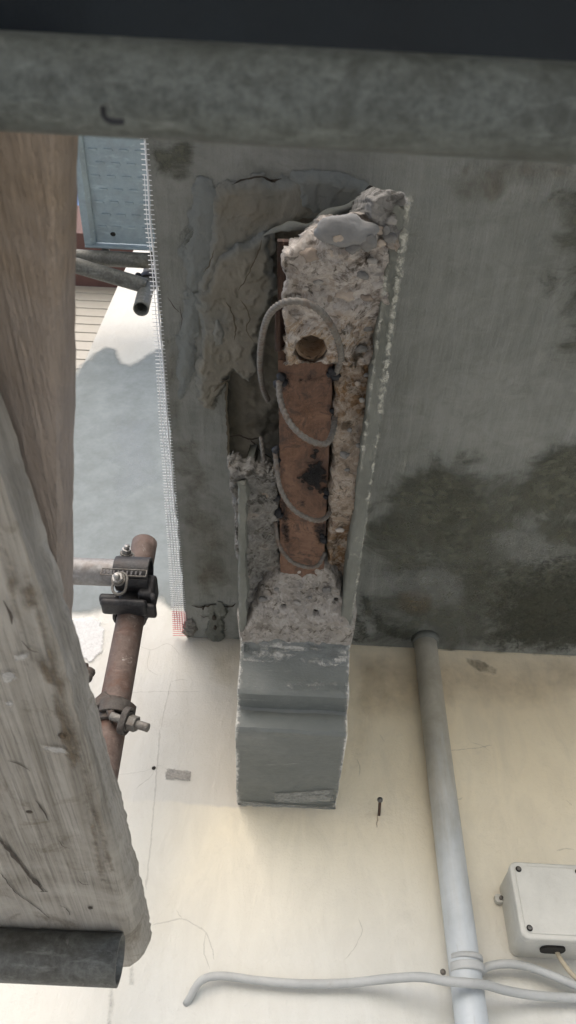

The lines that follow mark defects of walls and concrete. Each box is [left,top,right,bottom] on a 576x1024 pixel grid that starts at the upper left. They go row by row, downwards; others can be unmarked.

spalling [182,187,412,809]
water stain [353,448,576,651]